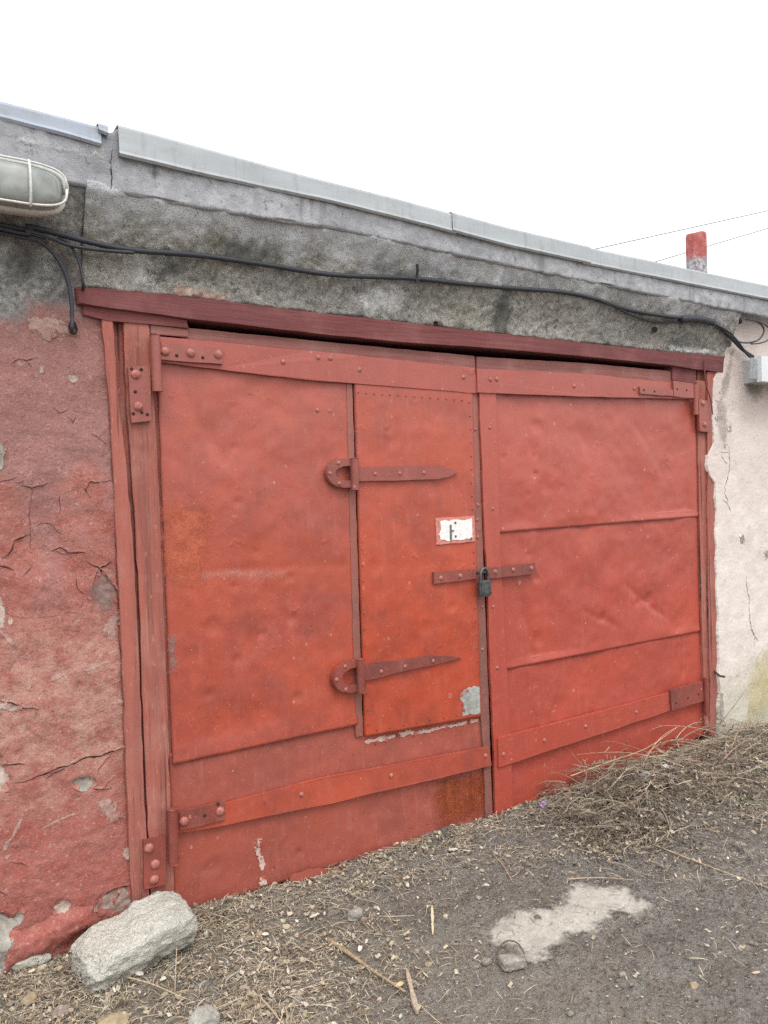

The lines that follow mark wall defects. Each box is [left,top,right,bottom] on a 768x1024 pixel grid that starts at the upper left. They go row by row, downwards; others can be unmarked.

crack [107,150,115,188]
water stain [360,285,405,313]
peeling [28,315,79,341]
crack [721,447,731,512]
crack [0,476,118,600]
peeling [365,686,481,745]
crack [2,745,125,792]
rust [437,774,484,823]
peeling [254,838,267,886]
spalling [50,898,71,916]
spalling [94,886,131,917]
spalling [0,906,26,979]